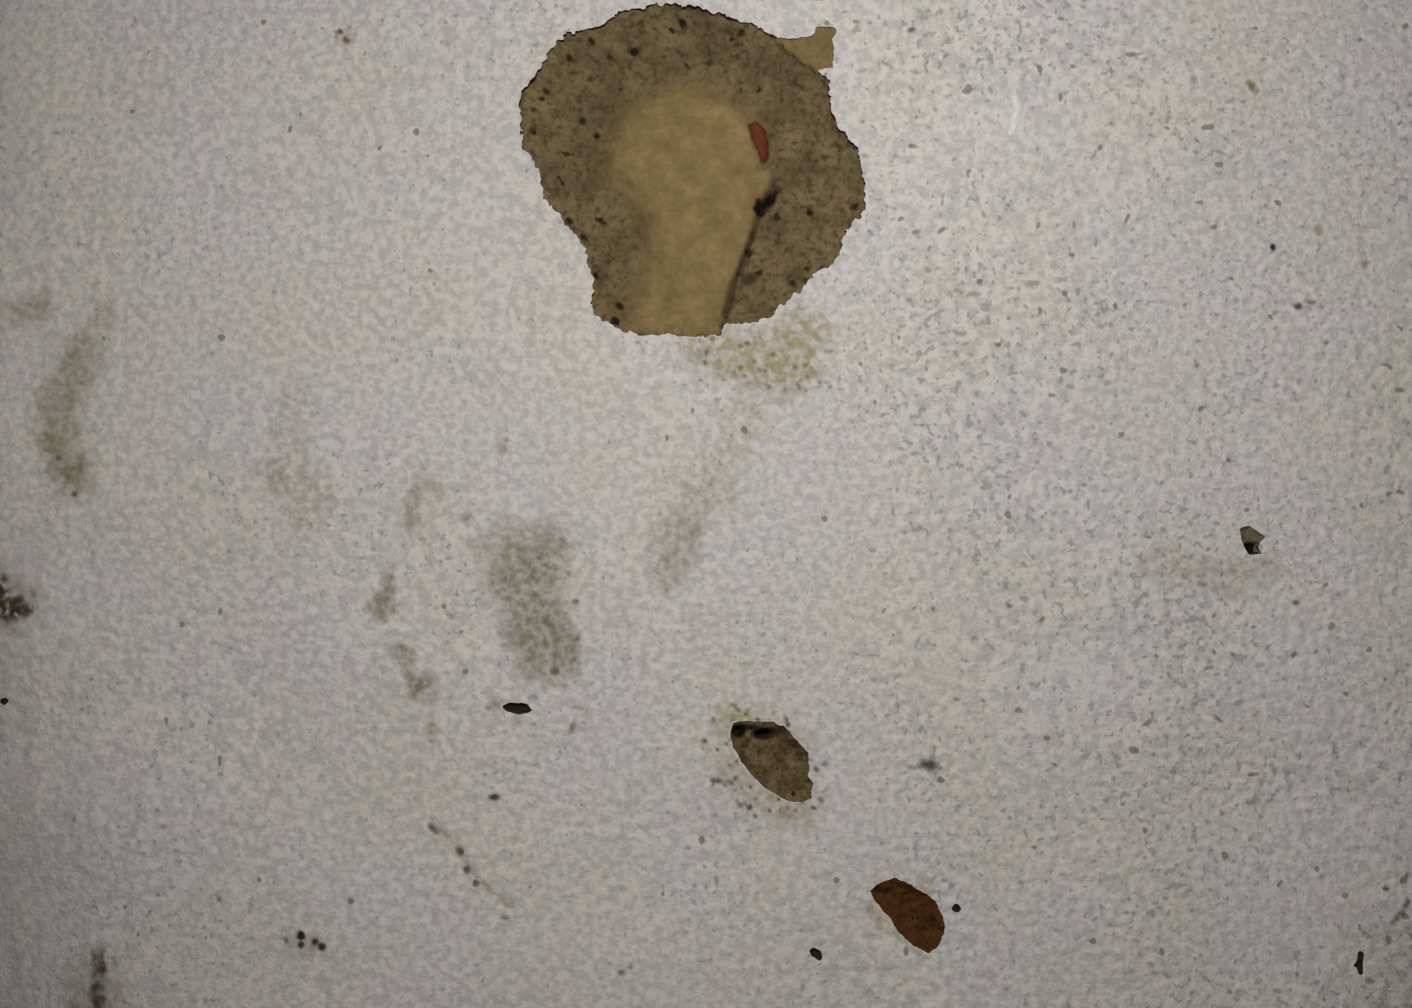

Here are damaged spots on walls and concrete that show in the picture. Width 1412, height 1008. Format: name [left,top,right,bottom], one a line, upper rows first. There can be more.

spalling [519,3,866,338]
peeling [1240,526,1265,555]
damp [0,579,31,620]
damp [502,540,575,675]
spalling [730,721,813,802]
spalling [870,878,961,953]